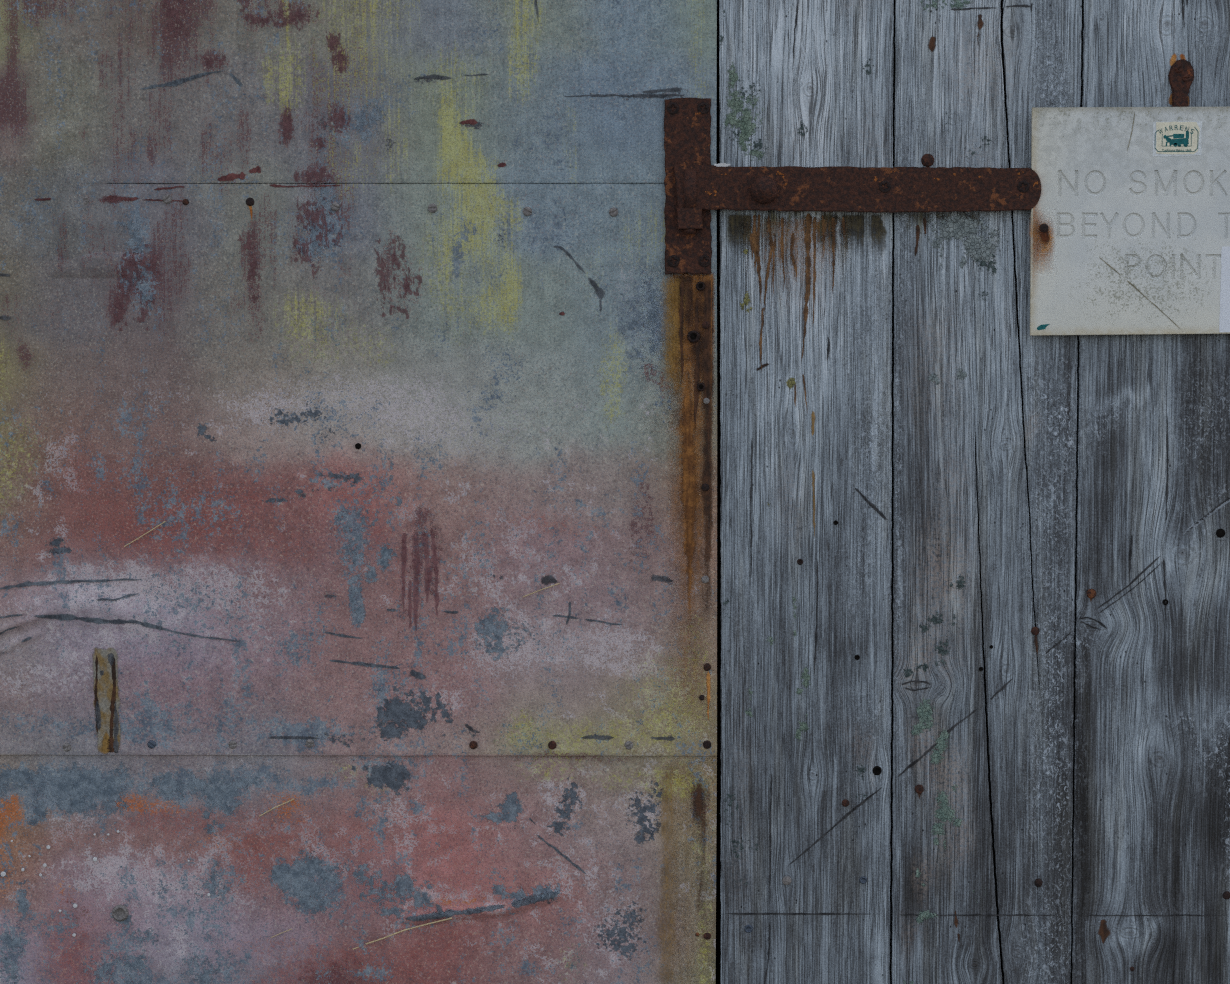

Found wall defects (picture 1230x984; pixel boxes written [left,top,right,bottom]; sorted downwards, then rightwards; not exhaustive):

corrosion [913,214,979,256]
corrosion [1032,213,1053,257]
corrosion [728,213,886,370]
corrosion [666,273,714,603]
corrosion [794,374,815,435]
peeling [473,607,535,661]
corrosion [93,648,121,754]
peeling [374,685,480,741]
crack [974,423,1004,984]
peeling [0,761,279,836]
peeling [352,760,419,796]
peeling [259,850,437,924]